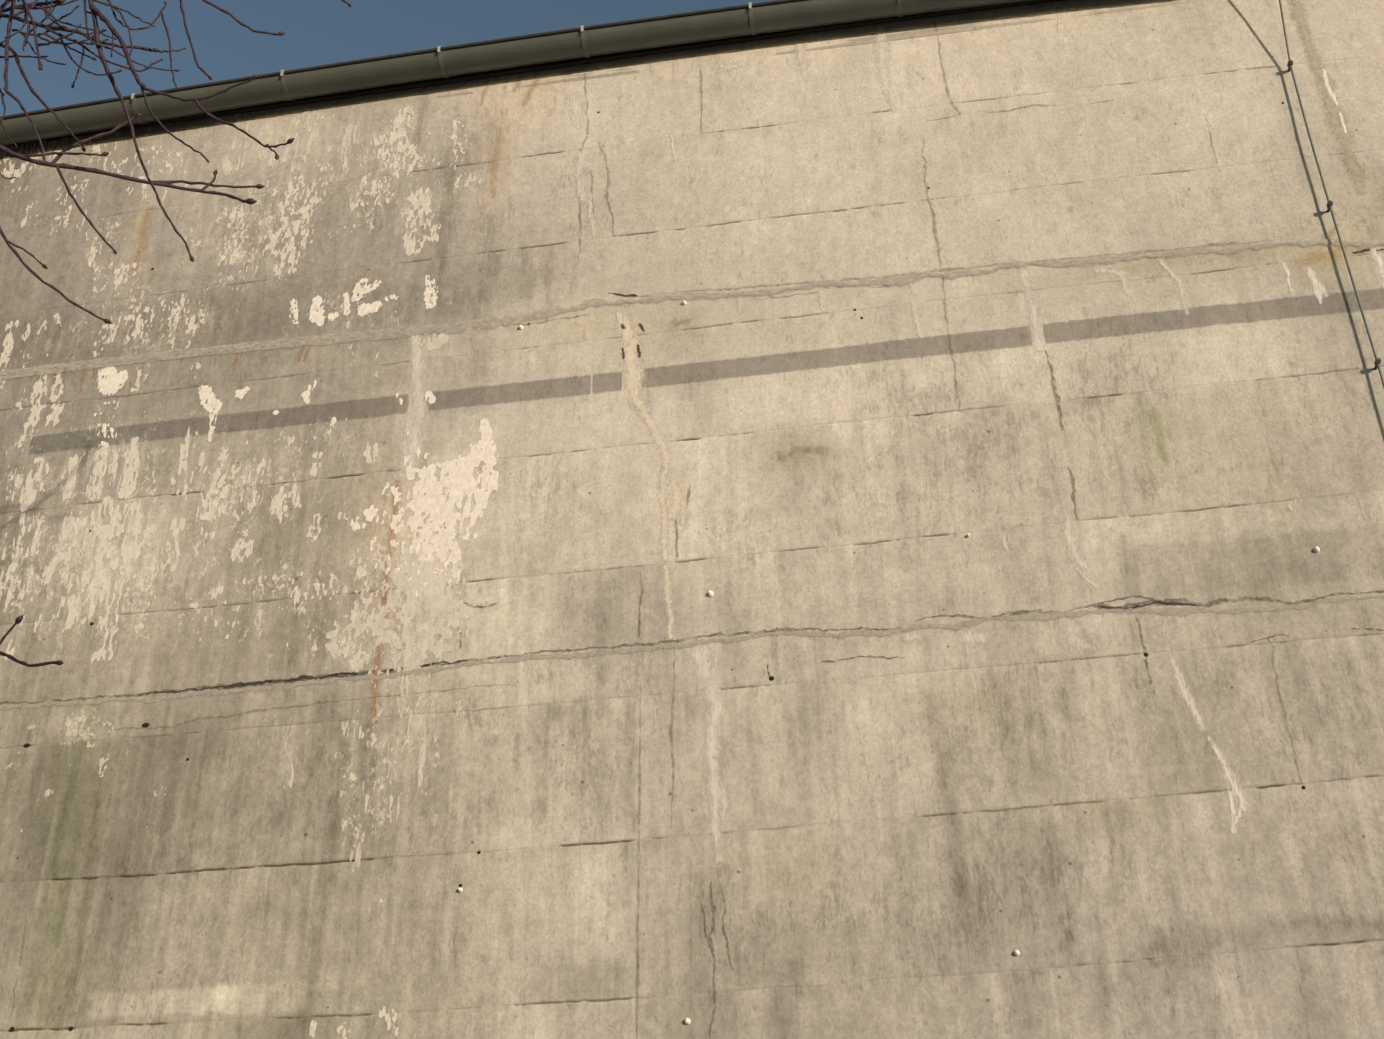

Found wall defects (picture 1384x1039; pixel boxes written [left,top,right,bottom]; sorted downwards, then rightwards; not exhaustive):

water stain [1307,267,1327,304]
water stain [1371,248,1384,287]
peeling [0,101,482,669]
water stain [615,311,727,863]
crack [0,591,1384,710]
water stain [1169,658,1245,834]